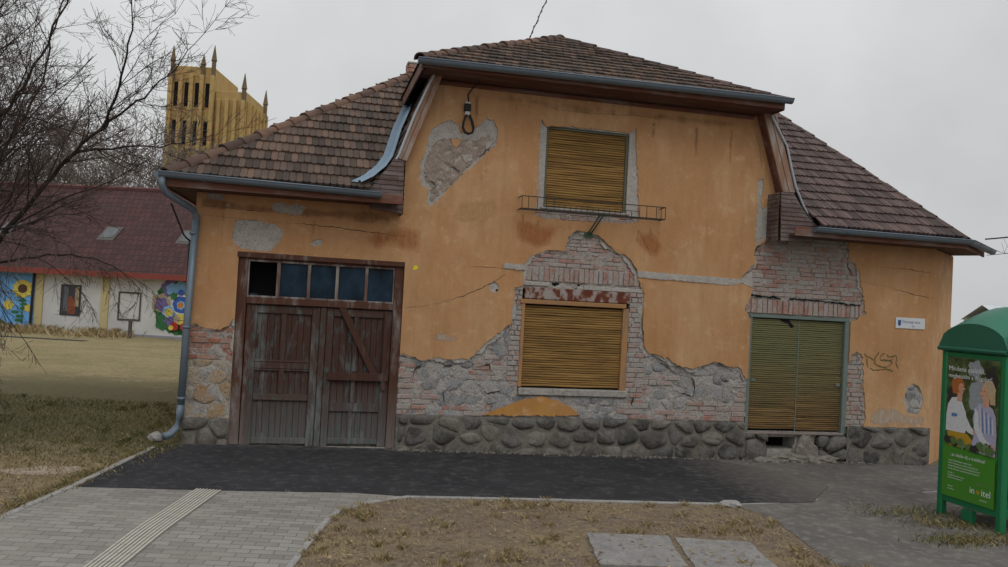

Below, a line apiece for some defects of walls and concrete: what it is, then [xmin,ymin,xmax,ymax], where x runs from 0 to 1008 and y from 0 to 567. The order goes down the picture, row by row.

peeling [232,203,306,252]
spalling [395,118,747,432]
spalling [742,179,866,328]
spalling [184,319,235,419]
spalling [903,384,923,415]